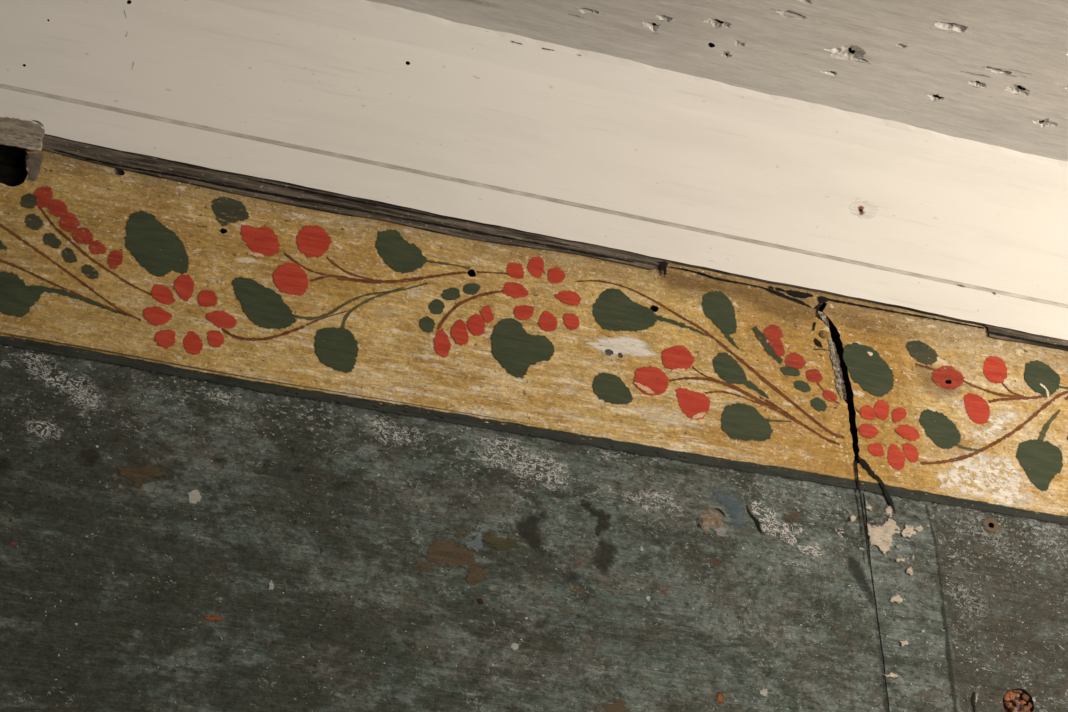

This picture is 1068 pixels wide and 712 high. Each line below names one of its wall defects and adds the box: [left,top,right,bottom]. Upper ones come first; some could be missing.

crack [54,149,1068,566]
peeling [747,501,825,567]
peeling [835,506,923,599]
crack [926,504,978,712]
peeling [882,666,899,712]